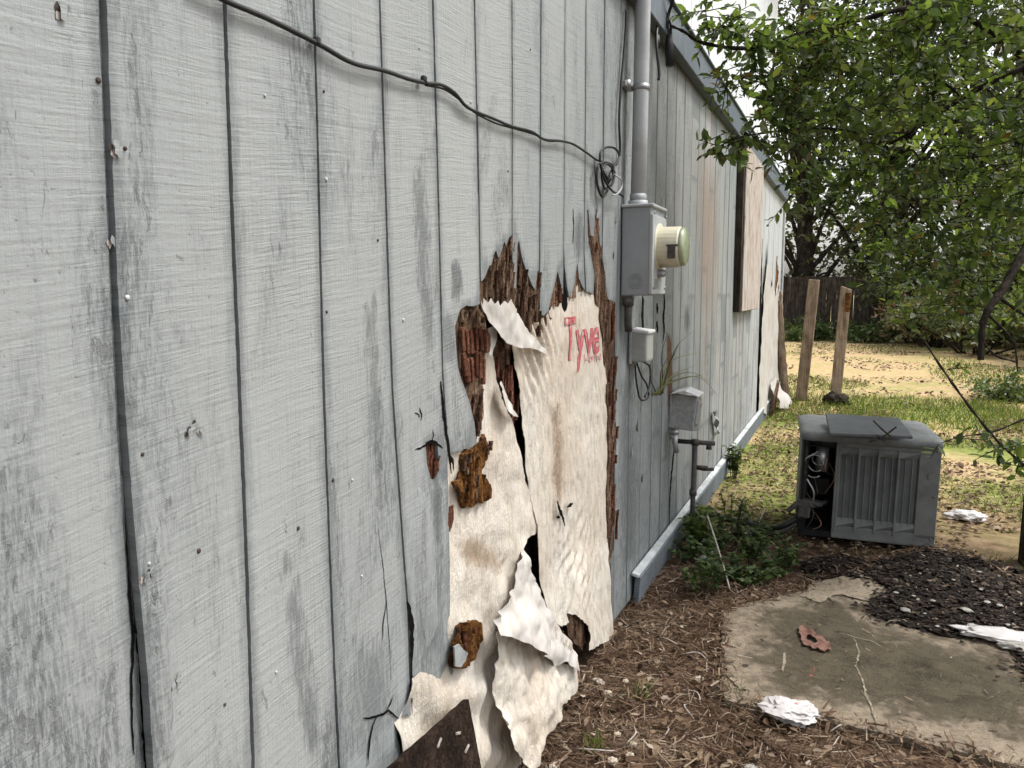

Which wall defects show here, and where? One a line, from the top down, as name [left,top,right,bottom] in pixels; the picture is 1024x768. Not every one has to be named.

peeling [554,284,563,307]
peeling [605,303,616,342]
peeling [456,235,542,505]
peeling [430,443,440,479]
crack [125,520,147,768]
crack [363,530,415,762]
peeling [453,627,477,667]